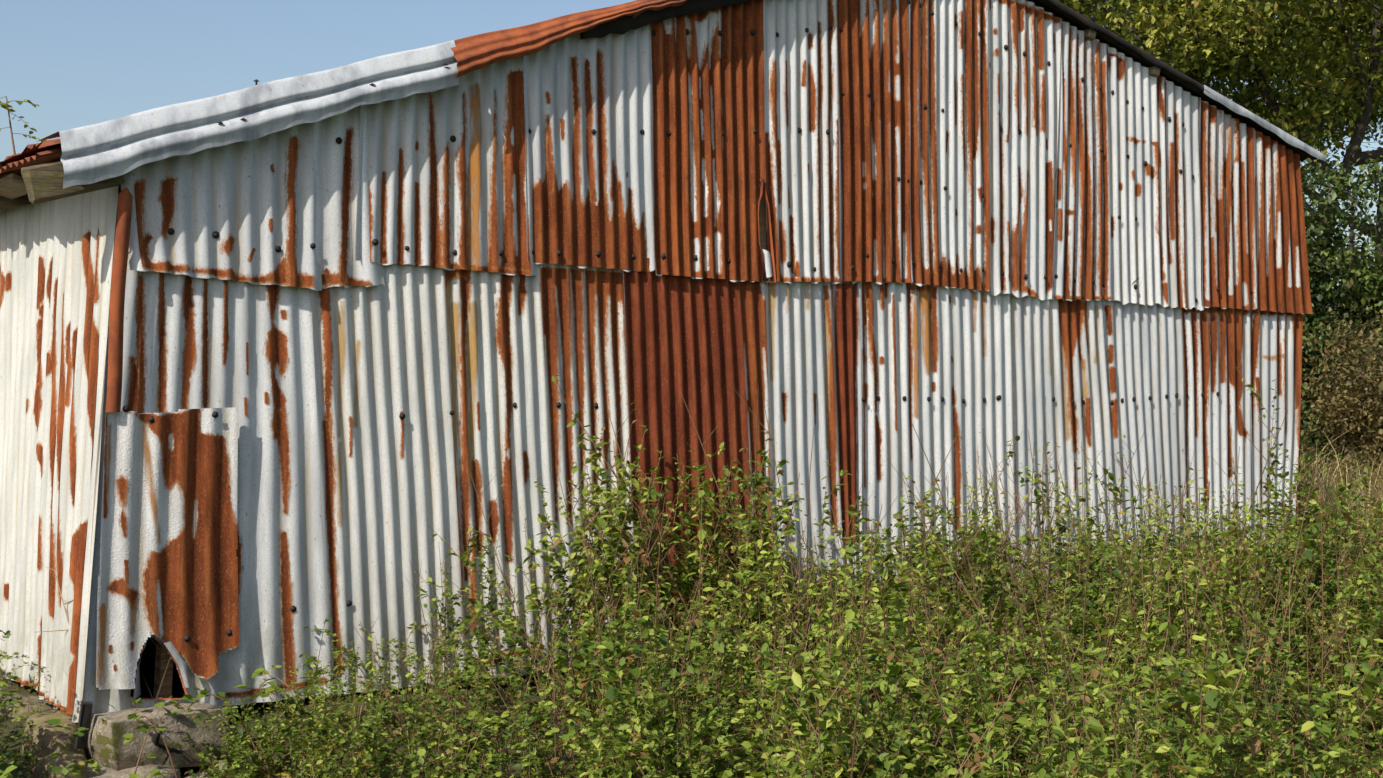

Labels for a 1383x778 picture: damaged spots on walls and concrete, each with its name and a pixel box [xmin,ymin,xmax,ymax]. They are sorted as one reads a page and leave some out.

rust [0,264,12,308]
rust [4,228,129,719]
rust [107,128,373,700]
rust [369,0,1313,653]